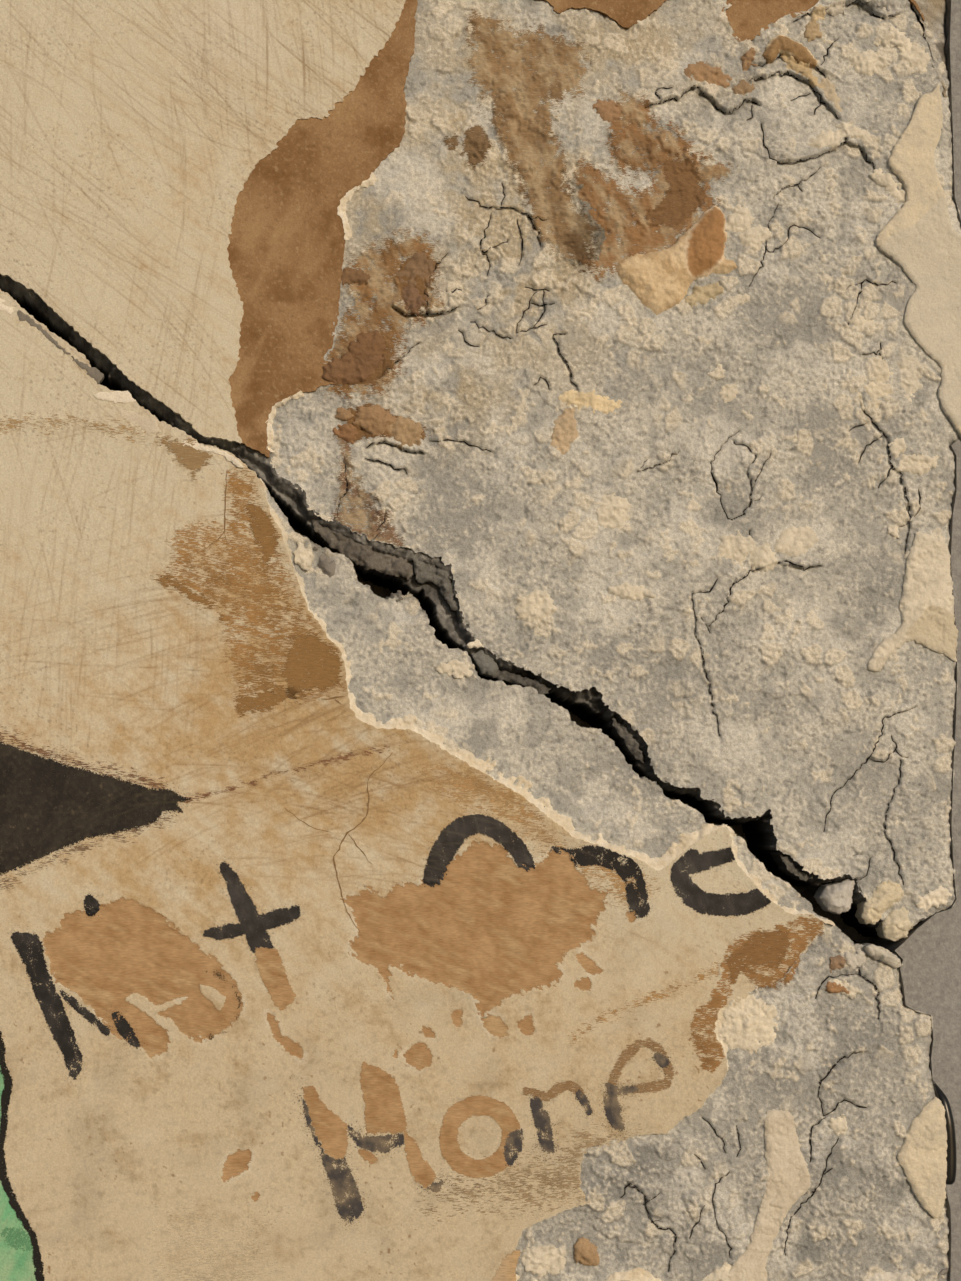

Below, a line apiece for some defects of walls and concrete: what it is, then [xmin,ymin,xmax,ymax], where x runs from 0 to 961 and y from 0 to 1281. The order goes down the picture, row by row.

crack [382,184,578,388]
crack [650,0,926,287]
crack [0,274,931,1019]
spalling [227,0,961,1281]
peeling [42,897,244,1058]
peeling [221,1149,252,1182]